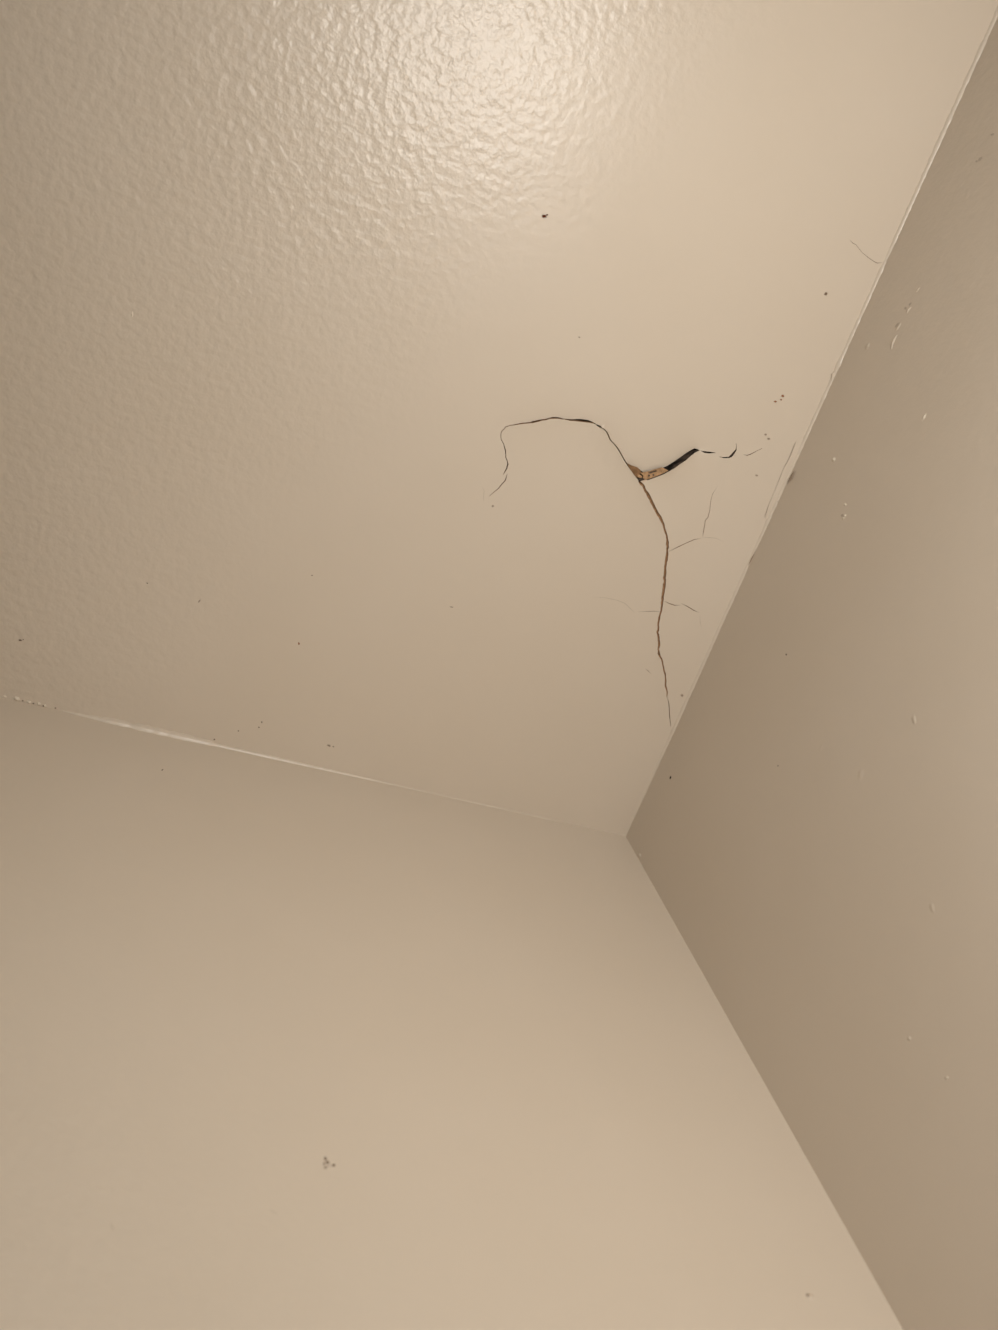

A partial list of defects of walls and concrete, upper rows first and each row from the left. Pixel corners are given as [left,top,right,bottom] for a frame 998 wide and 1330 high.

crack [492,417,762,725]